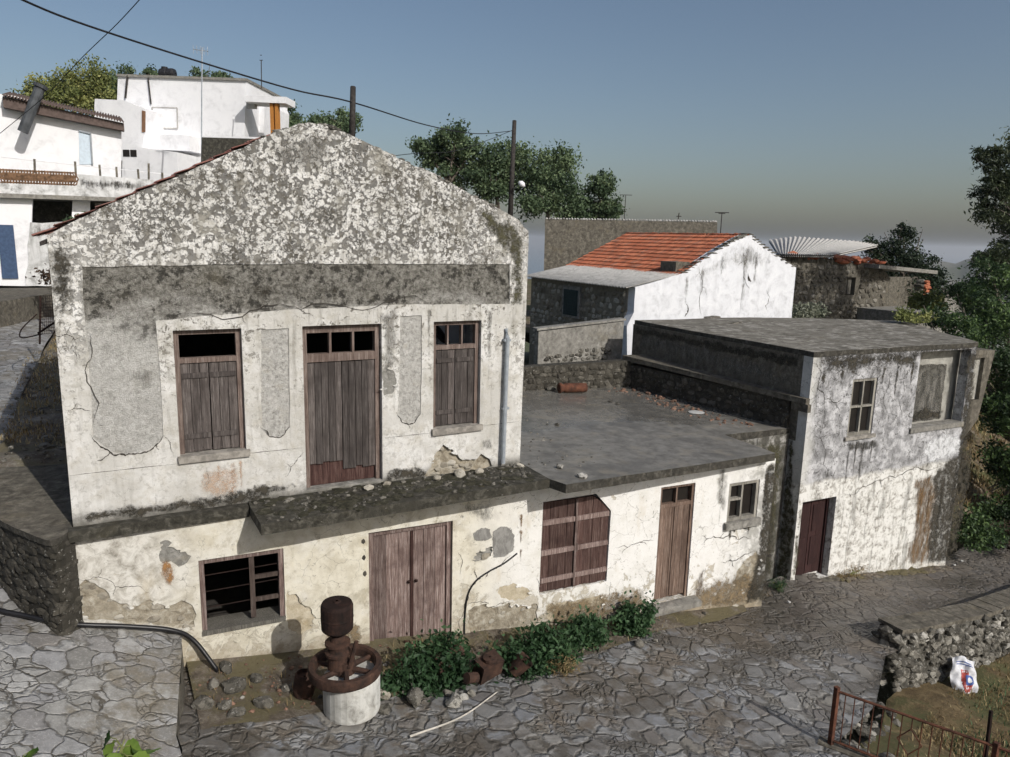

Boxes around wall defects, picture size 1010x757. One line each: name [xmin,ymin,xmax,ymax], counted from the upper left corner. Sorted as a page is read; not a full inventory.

crack [55,327,172,476]
leakage [821,351,944,420]
spalling [425,445,491,476]
leakage [928,348,977,562]
spalling [155,540,191,567]
spalling [472,547,492,564]
spalling [80,579,196,632]
spalling [468,583,605,632]